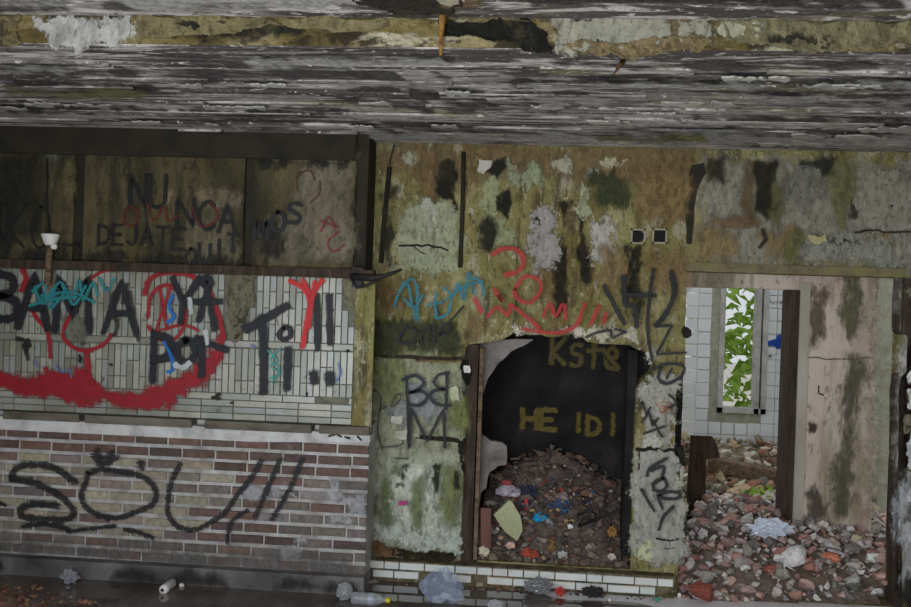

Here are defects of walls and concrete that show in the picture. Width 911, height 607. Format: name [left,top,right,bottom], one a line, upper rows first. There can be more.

spalling [32,0,911,60]
peeling [721,75,884,91]
peeling [757,111,911,148]
water stain [0,57,911,341]
crack [398,244,448,254]
peeling [557,323,638,344]
water stain [240,485,297,501]
water stain [328,353,469,555]
peeling [628,371,690,569]
water stain [830,355,870,519]
water stain [898,429,911,490]
spalling [903,371,911,467]